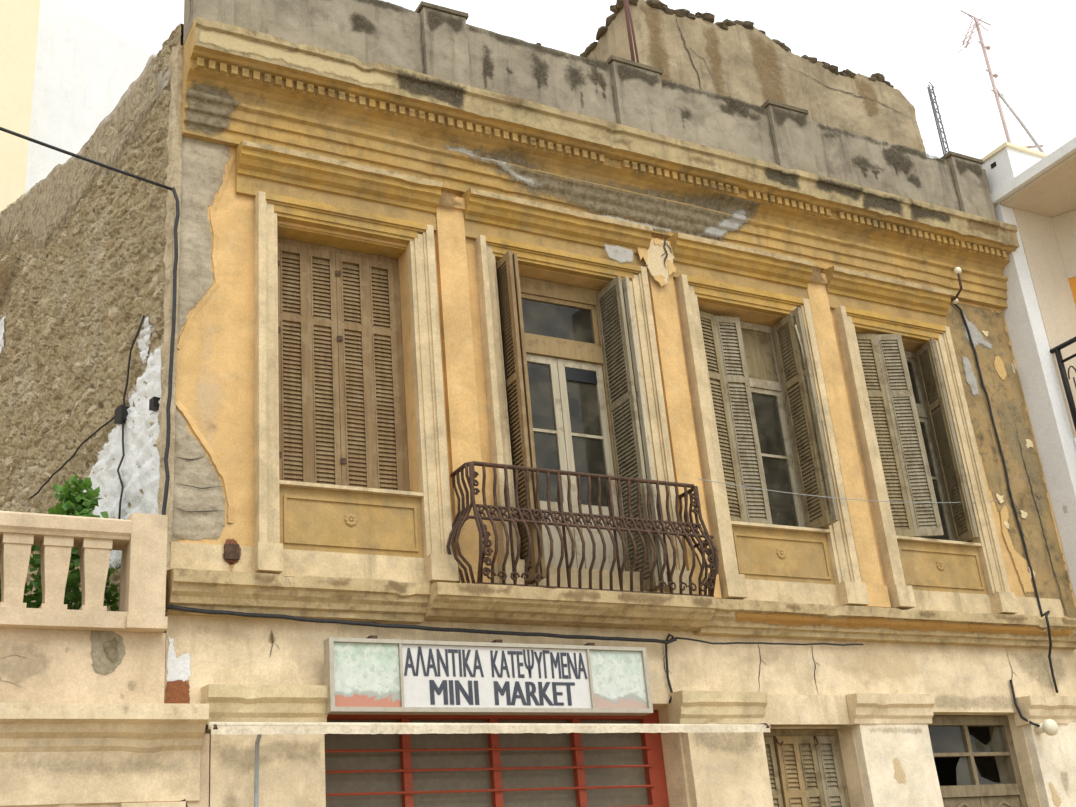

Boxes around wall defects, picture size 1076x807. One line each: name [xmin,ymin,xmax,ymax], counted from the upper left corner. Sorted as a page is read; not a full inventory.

flaking render [0,52,160,251]
leakage [185,80,240,135]
leakage [446,145,761,240]
leakage [483,6,807,126]
crack [676,16,718,90]
mould [765,168,800,187]
mould [818,124,982,221]
flaking render [177,137,236,350]
peeling [637,238,676,287]
peeling [82,316,235,541]
flaking render [945,302,1076,618]
peeling [165,635,191,704]